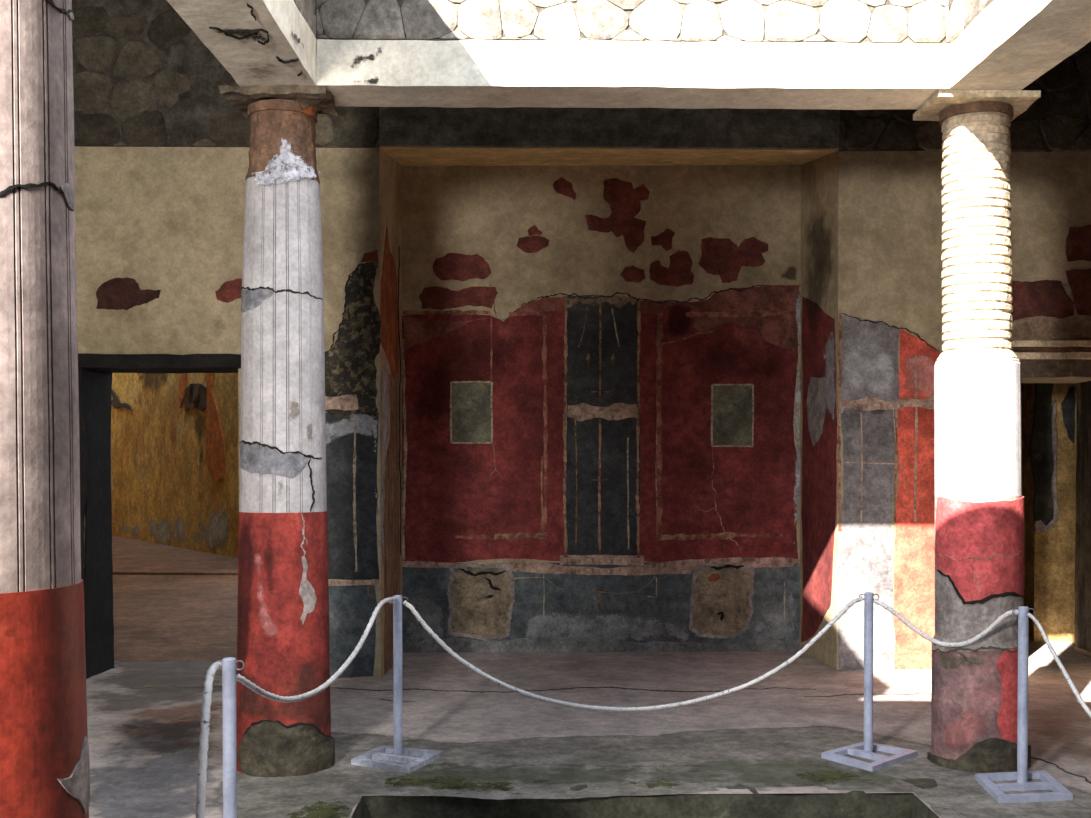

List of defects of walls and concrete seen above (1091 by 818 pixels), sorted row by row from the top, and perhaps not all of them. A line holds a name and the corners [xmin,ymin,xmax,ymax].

crack [48,0,74,15]
crack [209,3,302,77]
crack [0,182,64,196]
peeling [1010,315,1091,343]
crack [239,246,402,555]
spalling [299,556,317,624]
spalling [57,736,90,814]
spalling [237,719,335,777]